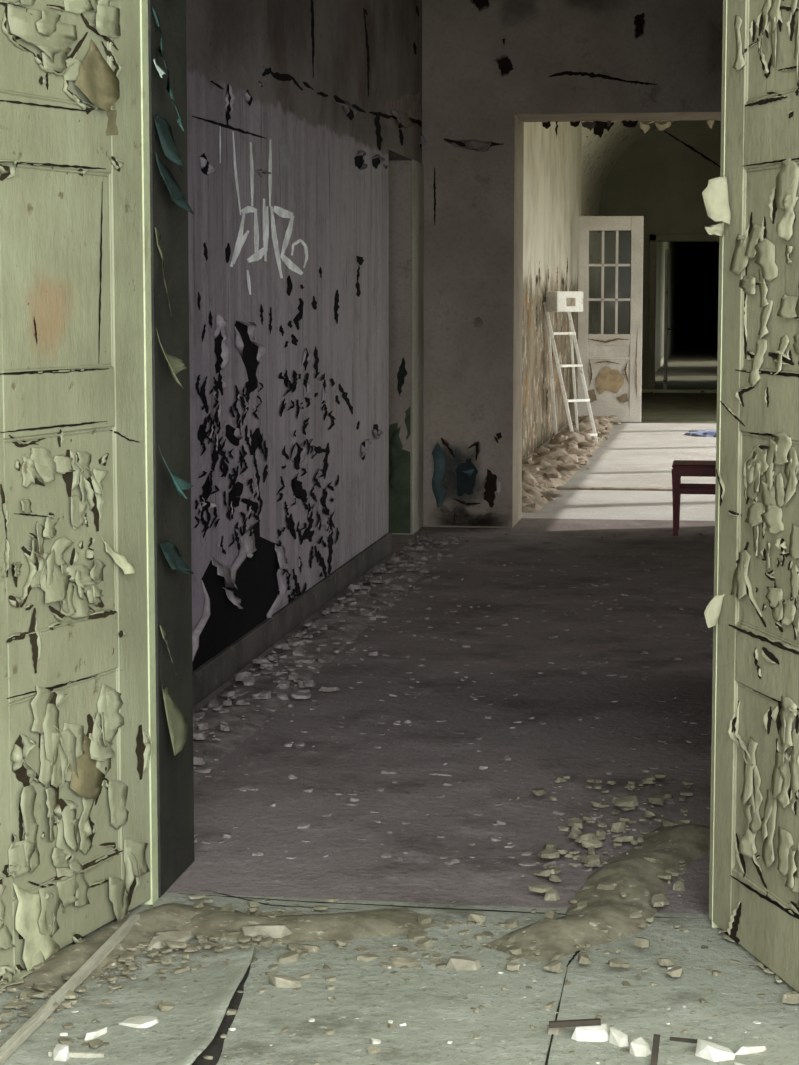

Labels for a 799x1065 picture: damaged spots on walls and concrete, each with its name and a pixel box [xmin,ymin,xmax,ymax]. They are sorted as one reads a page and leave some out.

peeling [0,0,123,136]
spalling [470,0,490,12]
spalling [495,38,513,76]
spalling [634,13,645,39]
peeling [152,7,426,214]
peeling [542,120,671,138]
peeling [355,256,364,297]
peeling [156,275,410,671]
peeling [432,438,500,508]
peeling [0,421,150,989]
peeling [159,625,187,756]
peeling [135,725,153,780]